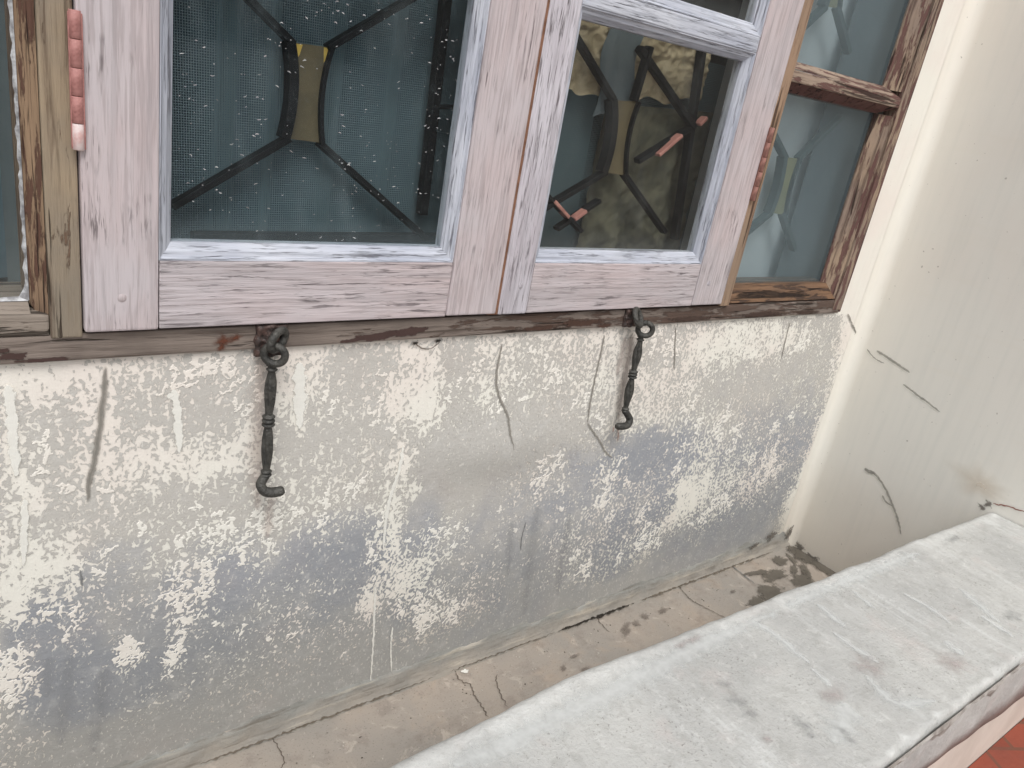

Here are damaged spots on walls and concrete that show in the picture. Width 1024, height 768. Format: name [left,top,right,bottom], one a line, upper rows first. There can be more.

crack [86,368,108,501]
rust [217,335,240,351]
crack [496,345,514,446]
crack [587,336,612,457]
crack [848,314,938,411]
damp [19,499,29,565]
peeling [0,313,846,768]
crack [865,468,901,534]
crack [453,552,771,716]
damp [455,525,914,766]